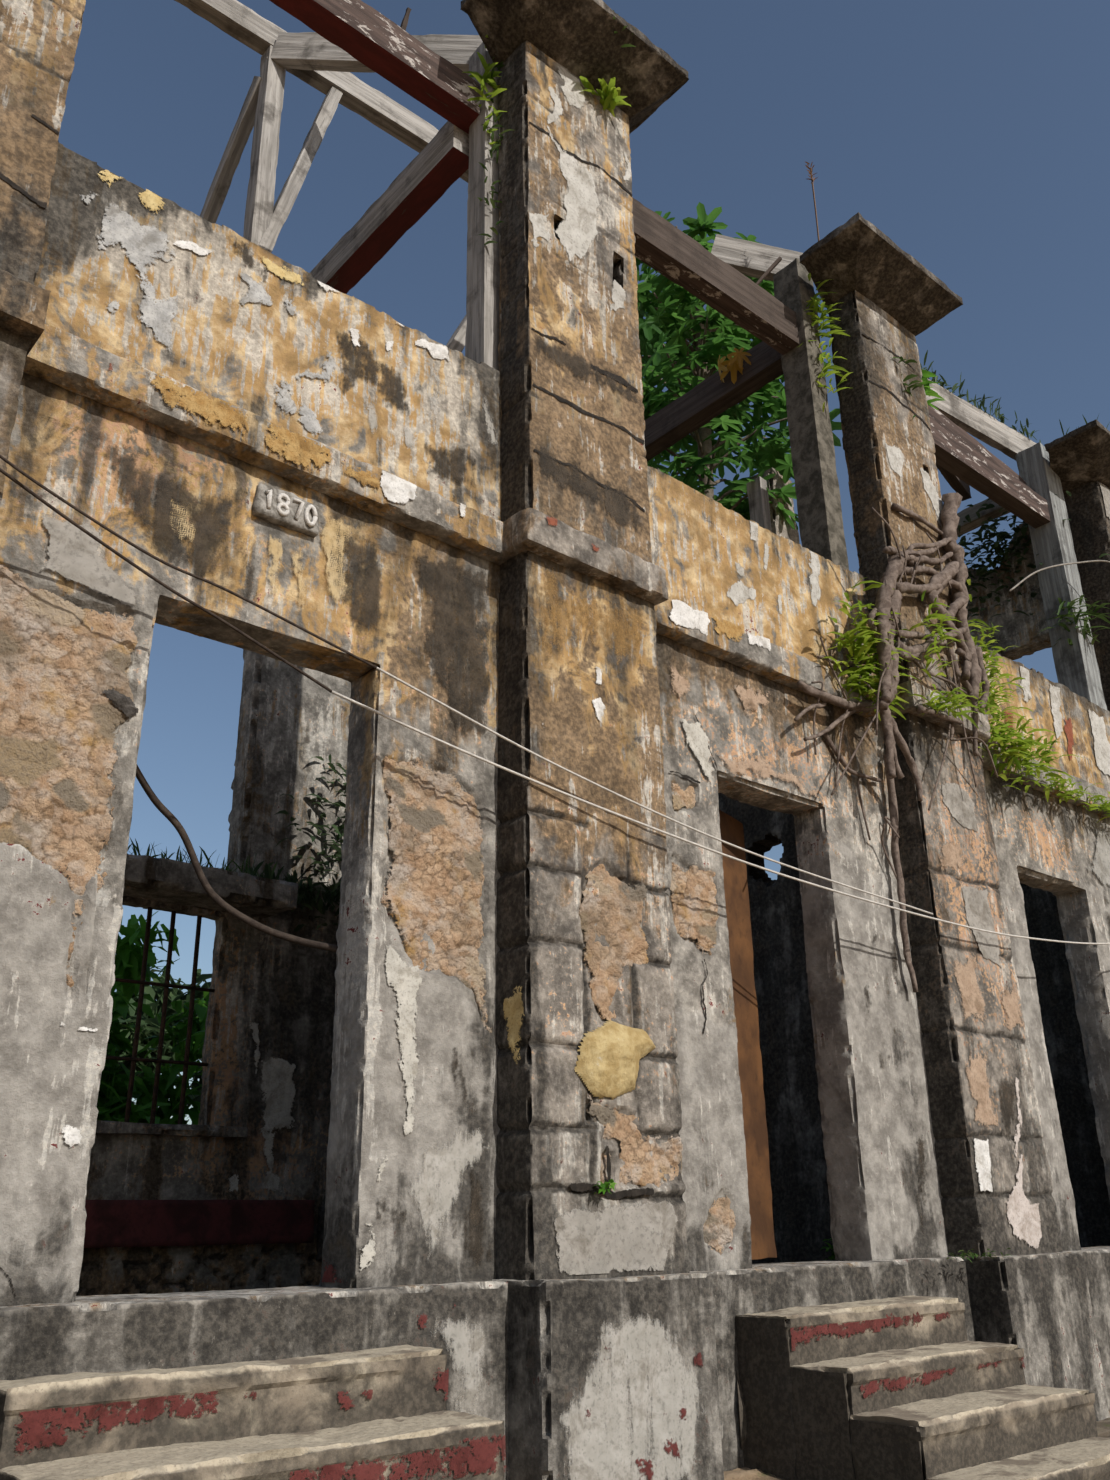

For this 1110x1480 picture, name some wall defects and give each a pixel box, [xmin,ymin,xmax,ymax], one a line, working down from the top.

peeling [79,170,211,351]
water stain [233,241,267,280]
peeling [239,254,339,317]
water stain [337,332,476,485]
peeling [415,338,449,361]
water stain [536,337,638,403]
water stain [107,445,304,606]
water stain [321,519,382,632]
water stain [418,556,490,737]
spalling [0,564,139,988]
spalling [380,756,525,1136]
spalling [579,864,649,1020]